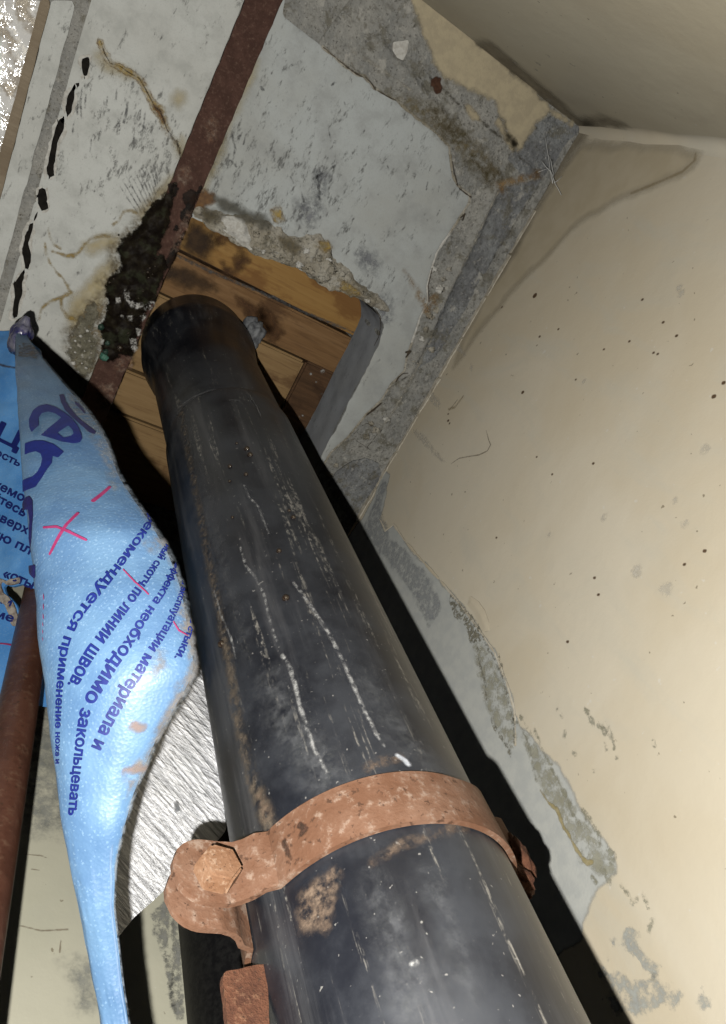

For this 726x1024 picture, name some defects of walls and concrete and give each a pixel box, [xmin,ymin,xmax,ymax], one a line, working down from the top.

corrosion [107,63,168,125]
water stain [42,143,249,378]
corrosion [177,190,282,247]
flaking render [193,206,389,312]
water stain [457,44,696,361]
water stain [236,297,283,341]
flaking render [317,0,616,955]
spalling [599,928,680,1014]